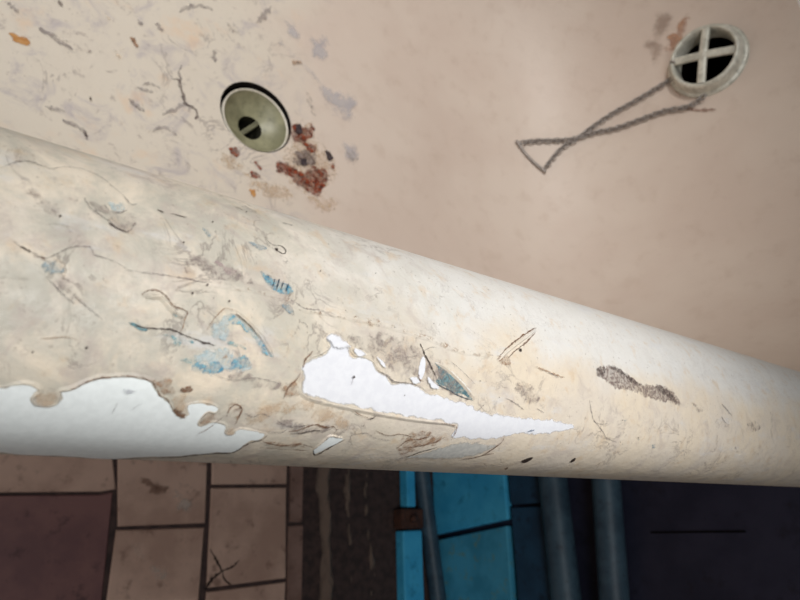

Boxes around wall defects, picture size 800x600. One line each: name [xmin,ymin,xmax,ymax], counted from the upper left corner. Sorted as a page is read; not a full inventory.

crack [156,74,199,135]
rust [276,123,335,196]
peeling [0,372,268,459]
peeling [298,327,574,440]